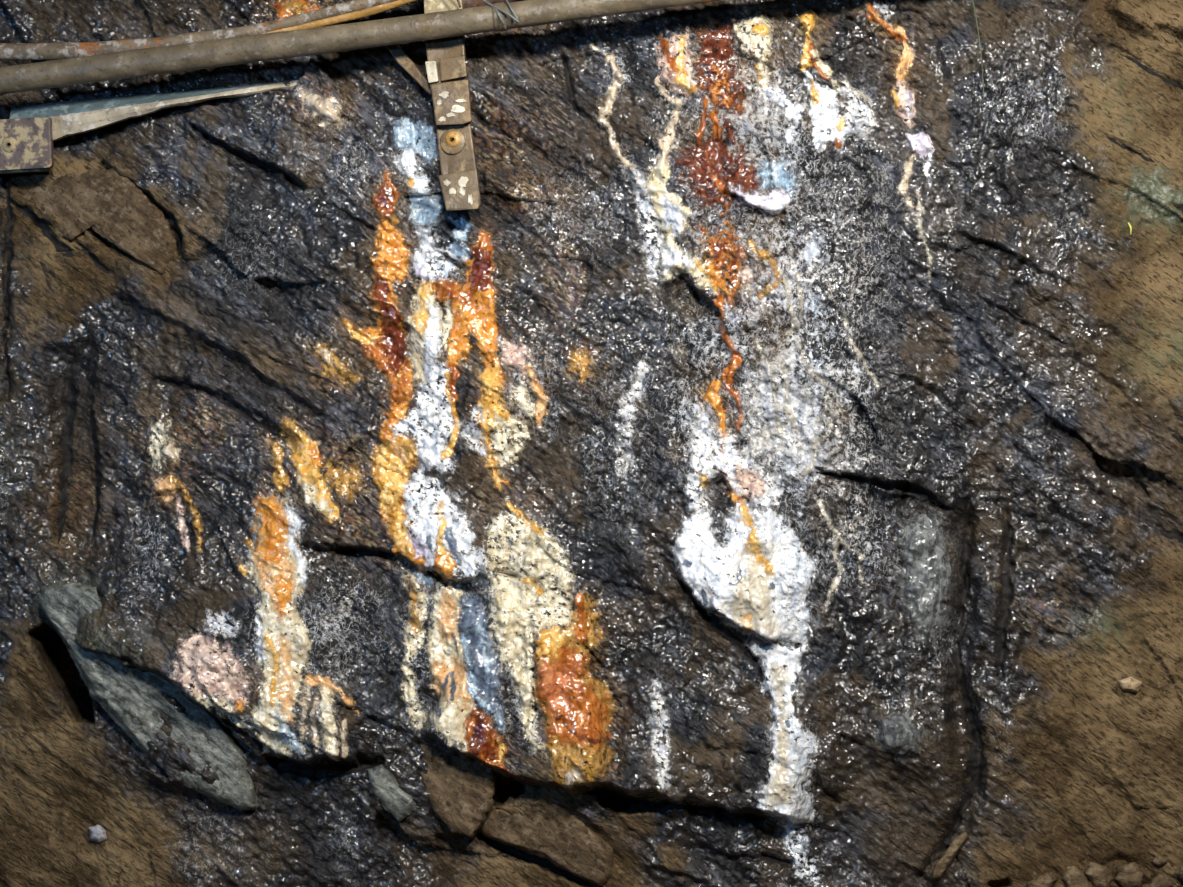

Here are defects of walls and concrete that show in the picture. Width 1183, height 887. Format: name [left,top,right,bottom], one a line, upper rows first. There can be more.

rust [269,171,436,578]
rust [428,230,511,490]
damp [390,118,576,755]
rust [675,24,782,489]
crack [964,235,1029,266]
crack [1002,308,1070,345]
rust [464,705,530,784]
rust [534,593,615,792]
crack [600,790,764,821]
damp [673,353,839,885]
crack [816,472,986,876]
crack [993,512,1014,676]